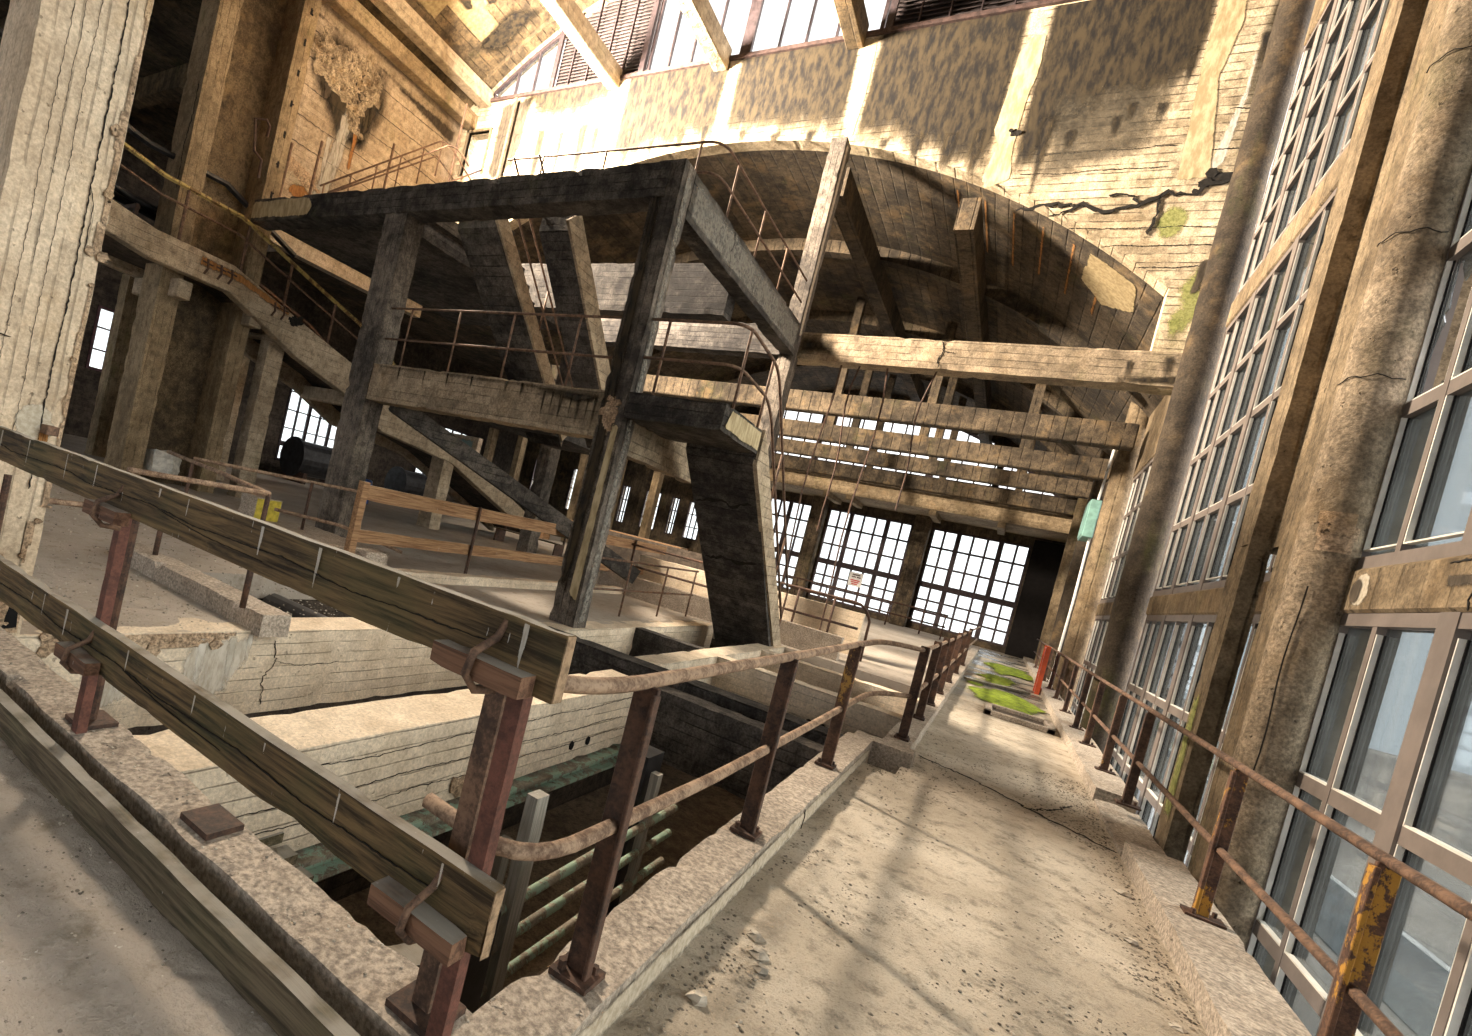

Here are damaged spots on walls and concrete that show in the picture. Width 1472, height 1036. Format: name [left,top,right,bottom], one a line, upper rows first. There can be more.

spalling [296,7,384,140]
water stain [488,89,633,179]
water stain [910,136,923,157]
water stain [940,35,1046,188]
water stain [1030,116,1076,189]
crack [1016,145,1239,269]
crack [1450,558,1472,611]
crack [1253,586,1309,770]